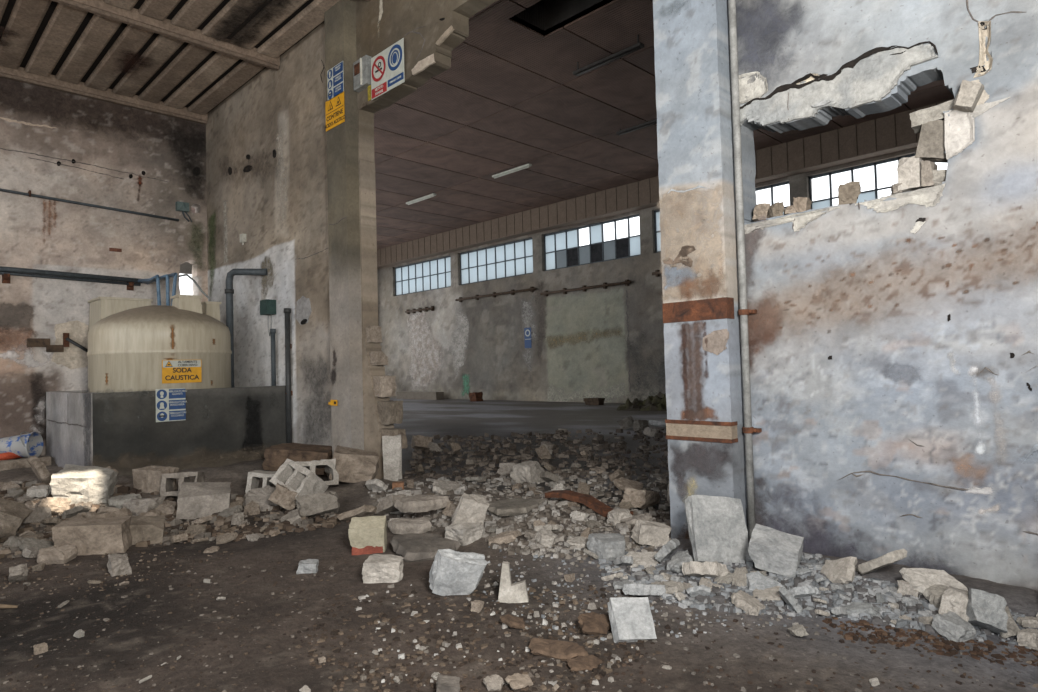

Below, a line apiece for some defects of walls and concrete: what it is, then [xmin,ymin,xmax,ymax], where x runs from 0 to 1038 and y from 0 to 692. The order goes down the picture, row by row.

water stain [213,0,290,46]
spalling [411,25,455,76]
spalling [732,44,939,127]
spalling [744,207,840,234]
spalling [855,183,946,234]
rust [665,322,738,443]
crack [839,470,967,491]